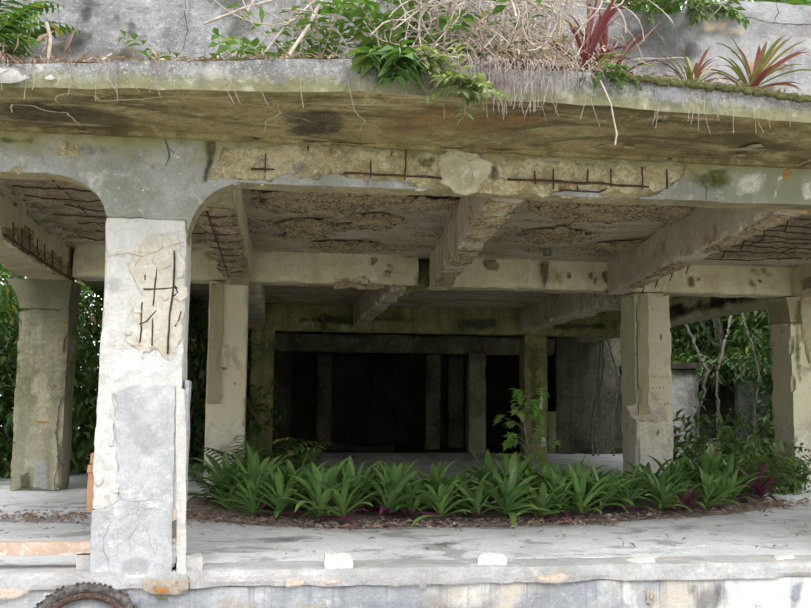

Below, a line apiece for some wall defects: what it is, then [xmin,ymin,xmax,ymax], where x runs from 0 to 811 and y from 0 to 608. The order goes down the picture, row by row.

damp [289,112,341,136]
damp [656,88,684,103]
spalling [0,166,107,241]
spalling [191,144,461,278]
spalling [450,154,694,266]
spalling [700,212,811,262]
spalling [126,231,188,360]
spalling [333,281,424,292]
spalling [625,261,692,293]
spalling [799,276,811,364]
spalling [627,403,668,435]
crack [98,489,168,563]